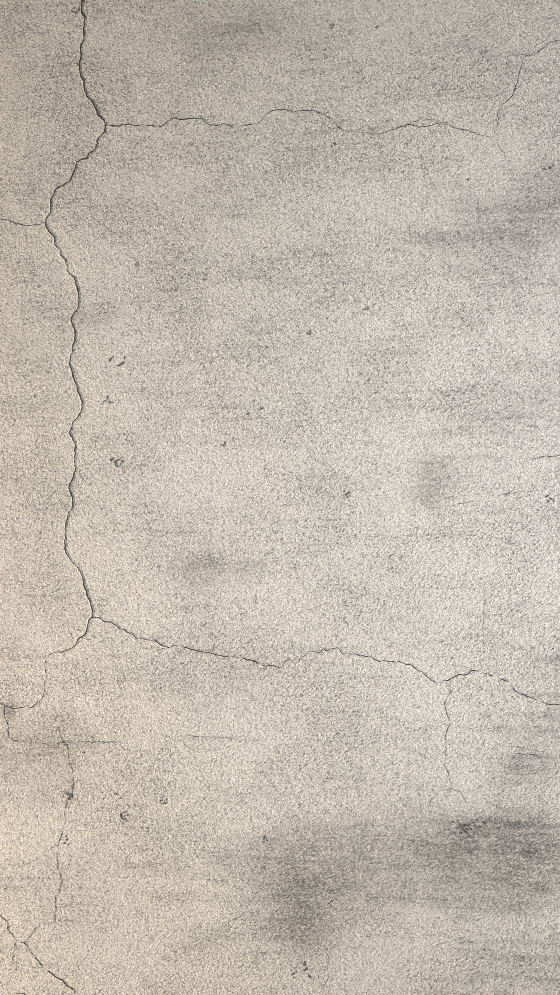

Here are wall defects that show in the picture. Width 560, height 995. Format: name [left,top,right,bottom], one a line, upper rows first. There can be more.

crack [1,0,559,742]
crack [0,727,108,994]